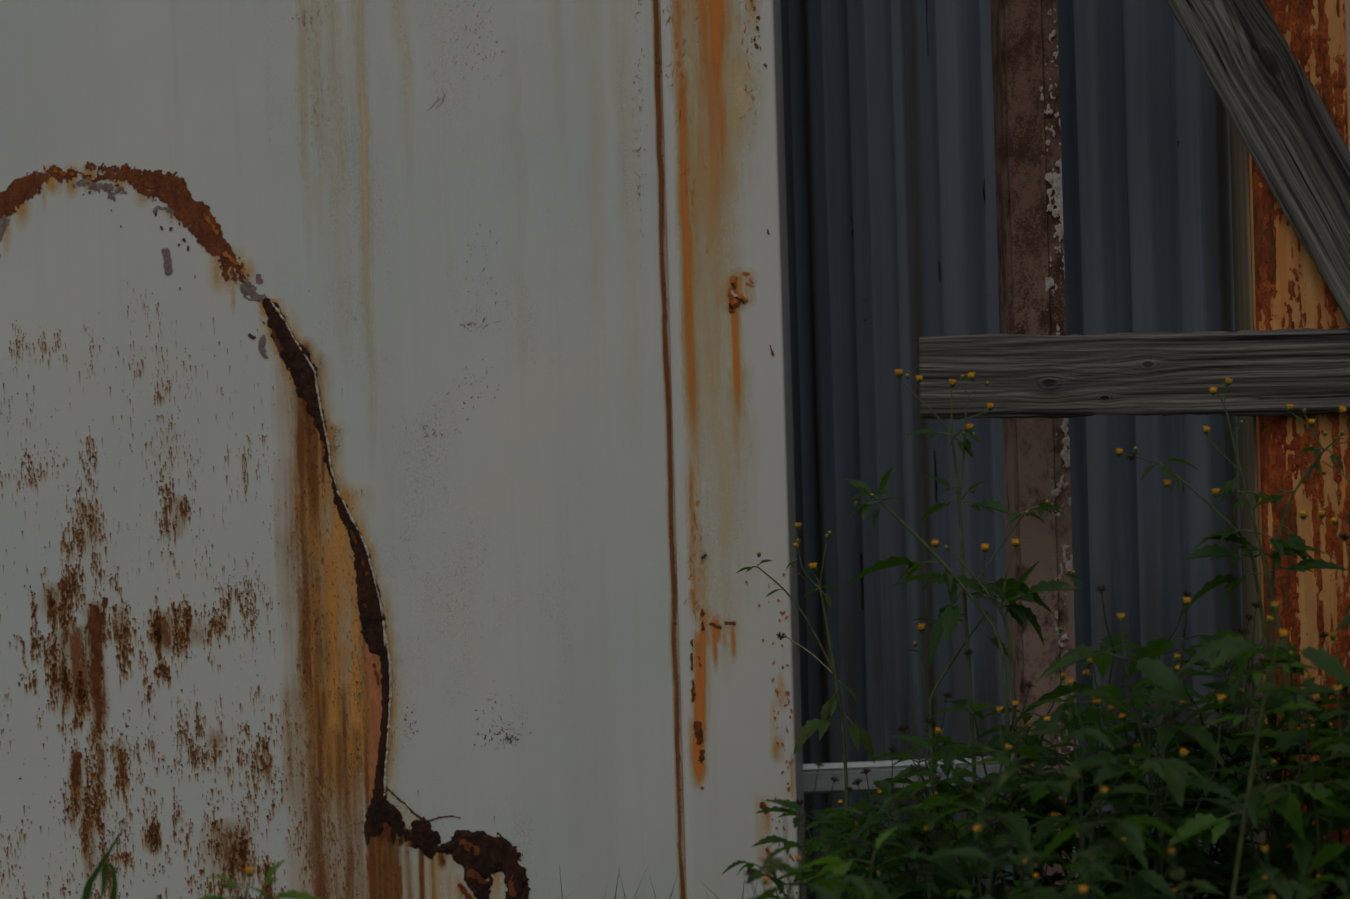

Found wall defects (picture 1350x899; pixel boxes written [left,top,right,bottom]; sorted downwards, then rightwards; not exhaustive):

rust [1263,0,1348,146]
crack [393,212,509,437]
rust [653,0,736,899]
rust [726,272,754,413]
rust [1251,155,1339,331]
rust [0,282,530,899]
crack [259,298,461,838]
crack [474,681,532,750]
rust [1259,413,1350,849]